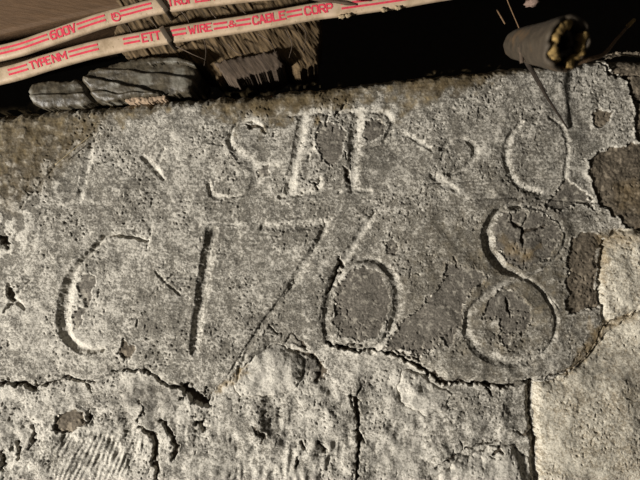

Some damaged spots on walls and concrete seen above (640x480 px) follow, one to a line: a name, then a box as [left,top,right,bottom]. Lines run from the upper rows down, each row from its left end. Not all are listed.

spalling [0,55,129,117]
spalling [305,0,640,268]
peeling [564,232,606,313]
crack [269,326,307,349]
crack [0,375,95,389]
crack [113,367,182,388]
crack [326,341,587,456]
crack [349,388,365,480]
crack [438,439,498,465]